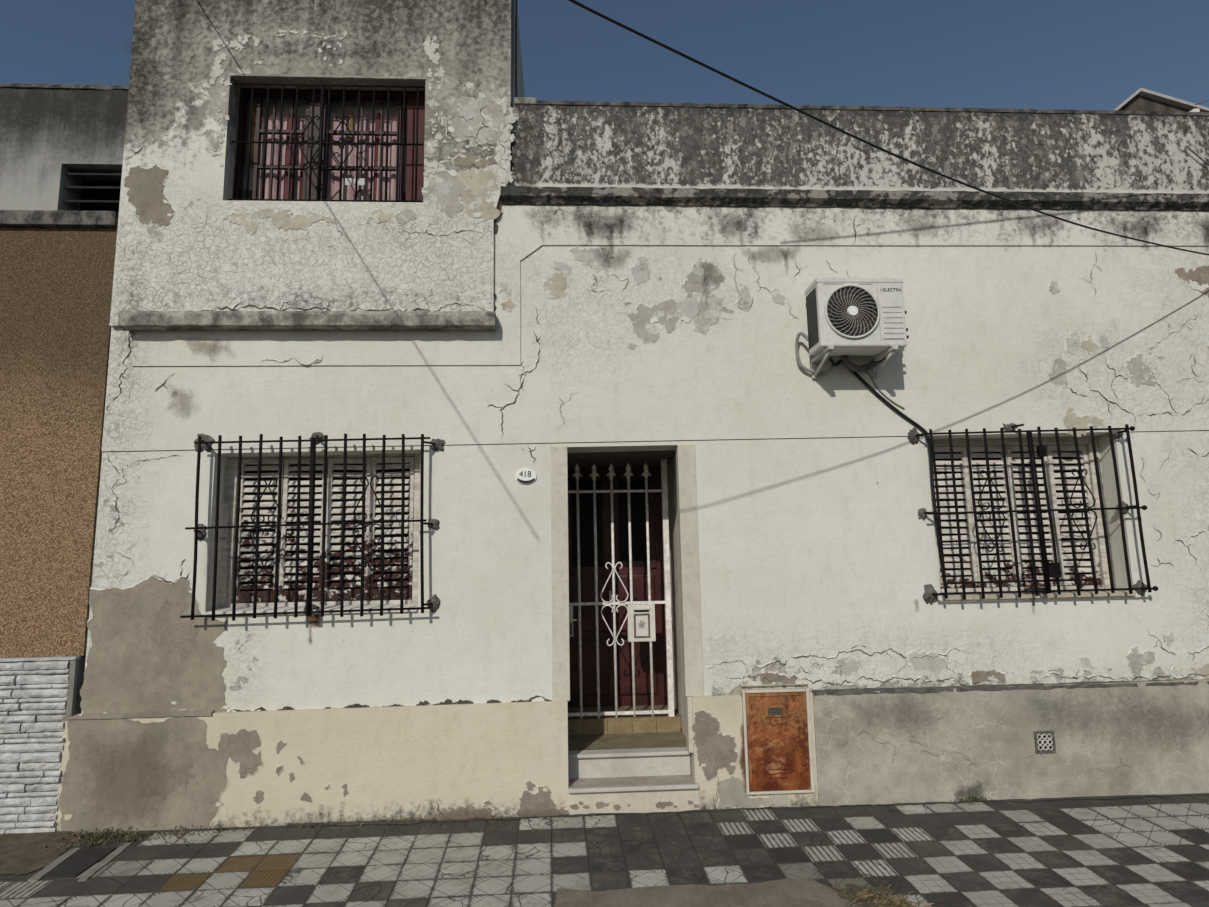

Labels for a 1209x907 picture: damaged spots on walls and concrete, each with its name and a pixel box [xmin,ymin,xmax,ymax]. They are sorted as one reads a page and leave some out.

spalling [421,35,519,221]
spalling [124,163,174,243]
peeling [626,255,751,350]
peeling [1175,266,1209,299]
crack [491,308,575,463]
crack [1070,314,1208,421]
crack [108,455,188,584]
crack [1140,447,1209,567]
spalling [58,575,306,833]
spalling [691,709,739,782]
rust [740,726,750,786]
peeling [968,670,1007,685]